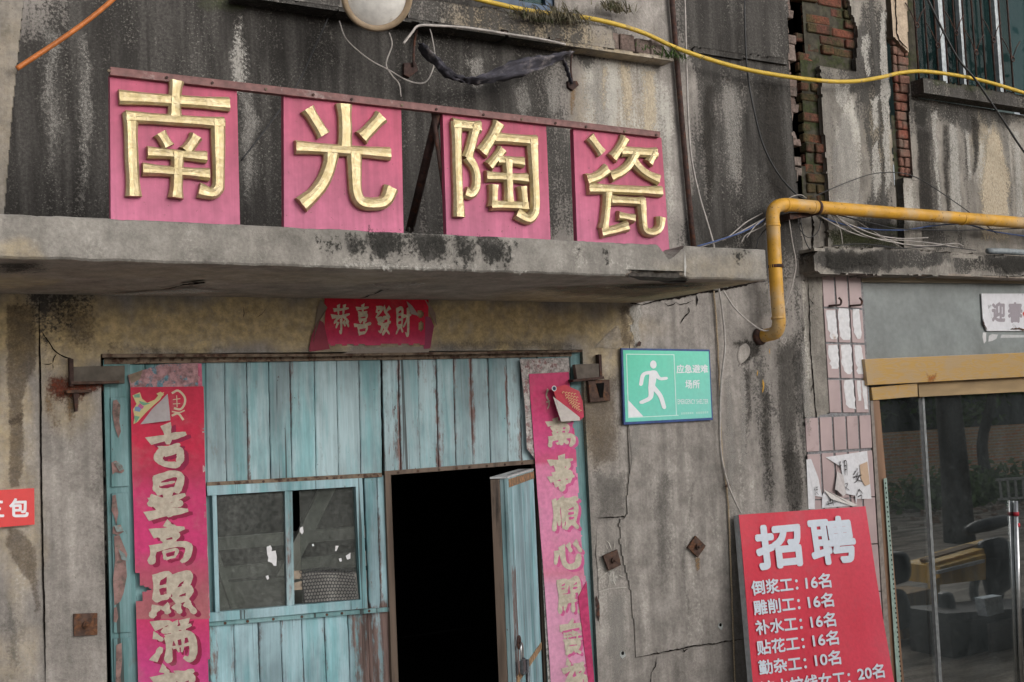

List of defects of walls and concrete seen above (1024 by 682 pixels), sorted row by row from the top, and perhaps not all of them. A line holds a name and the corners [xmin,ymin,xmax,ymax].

water stain [80,47,92,177]
spalling [787,0,917,207]
water stain [914,104,1024,242]
water stain [315,225,527,272]
corrosion [46,377,102,424]